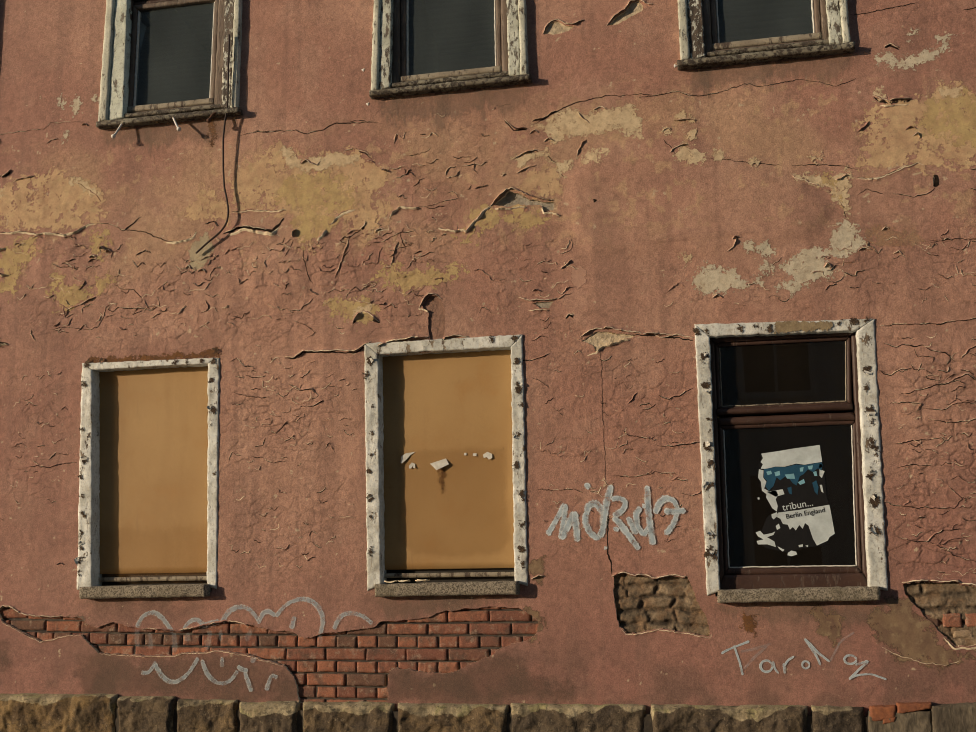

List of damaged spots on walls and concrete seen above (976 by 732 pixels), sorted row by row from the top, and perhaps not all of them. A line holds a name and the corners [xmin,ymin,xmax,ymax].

spalling [606,0,654,25]
crack [0,197,492,338]
crack [242,120,374,135]
peeling [0,92,650,429]
peeling [661,77,976,308]
crack [229,356,323,407]
crack [600,355,702,496]
crack [875,317,976,468]
spalling [582,508,711,640]
spalling [866,353,976,670]
crack [883,486,976,562]
spalling [0,603,546,703]